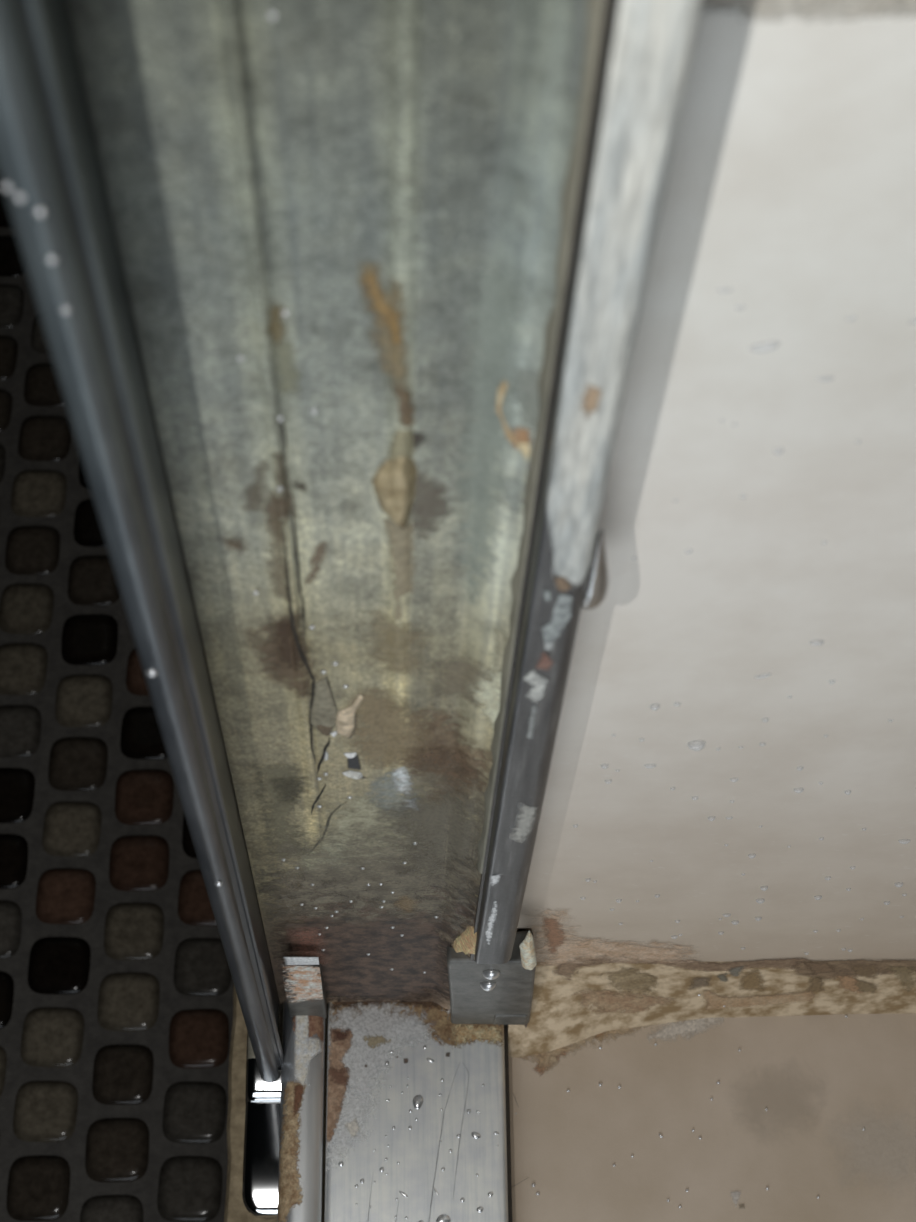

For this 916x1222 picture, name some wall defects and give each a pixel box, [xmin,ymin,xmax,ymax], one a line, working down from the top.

corrosion [359,264,414,427]
corrosion [495,380,531,460]
crack [283,503,347,856]
damp [256,690,493,1002]
peeling [520,931,537,970]